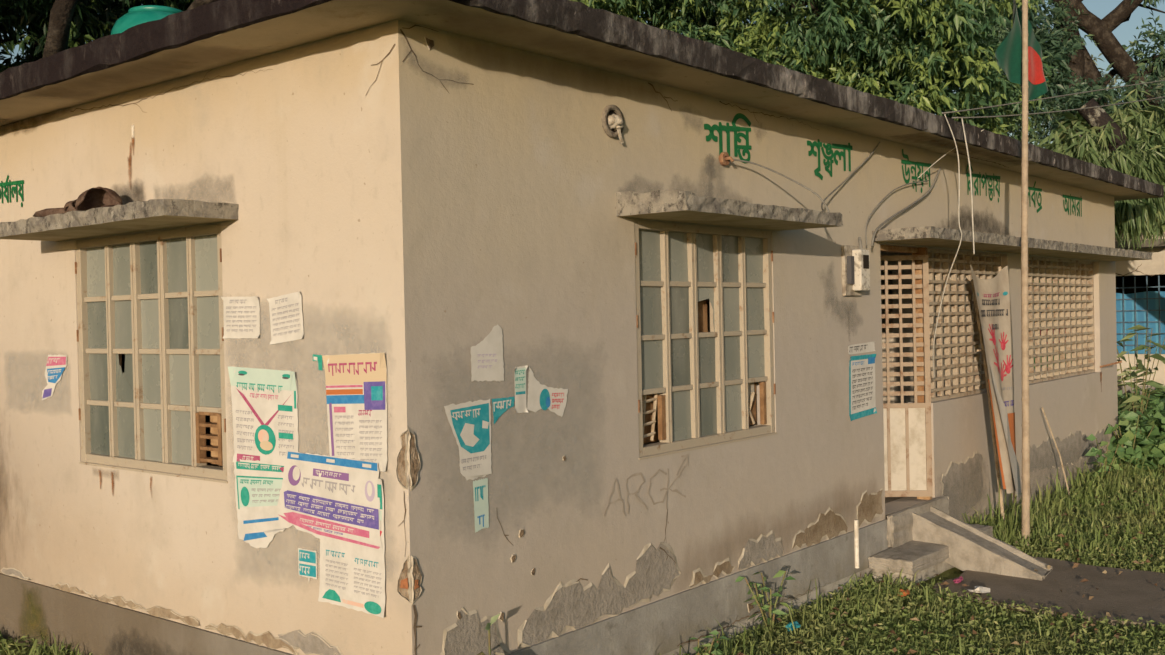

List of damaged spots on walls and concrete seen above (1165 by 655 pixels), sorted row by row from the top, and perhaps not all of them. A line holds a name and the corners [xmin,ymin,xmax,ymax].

crack [366,25,474,95]
flaking render [396,426,421,491]
flaking render [1,567,32,580]
flaking render [397,555,422,606]
flaking render [440,488,884,655]
flaking render [51,582,343,655]